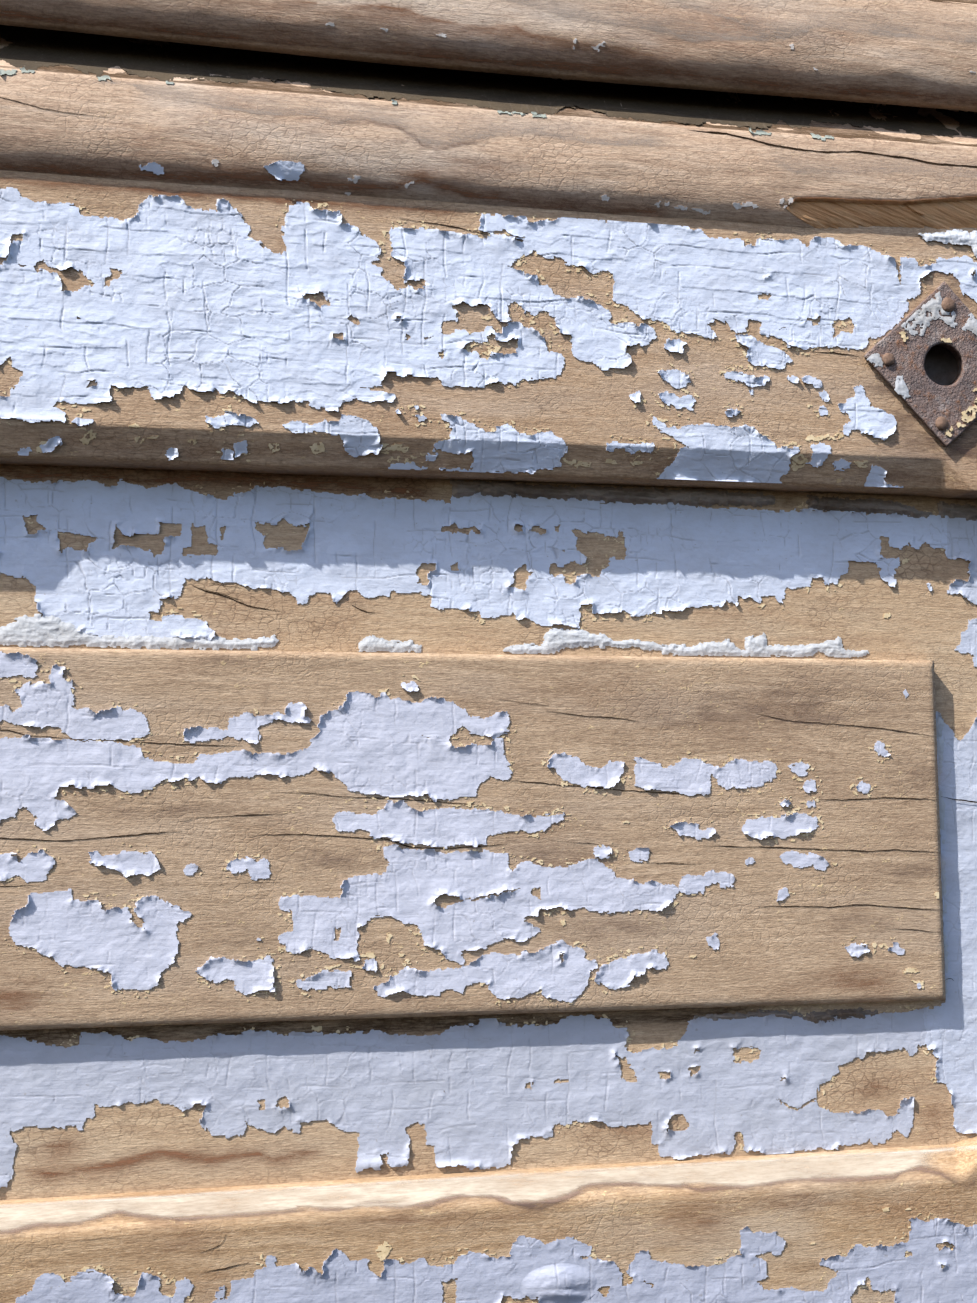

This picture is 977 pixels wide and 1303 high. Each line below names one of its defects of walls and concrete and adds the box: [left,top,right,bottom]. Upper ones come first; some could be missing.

crack [692,130,977,168]
peeling [139,162,164,175]
peeling [264,160,305,181]
peeling [0,175,977,1188]
peeling [212,1208,977,1303]
peeling [15,1265,194,1303]